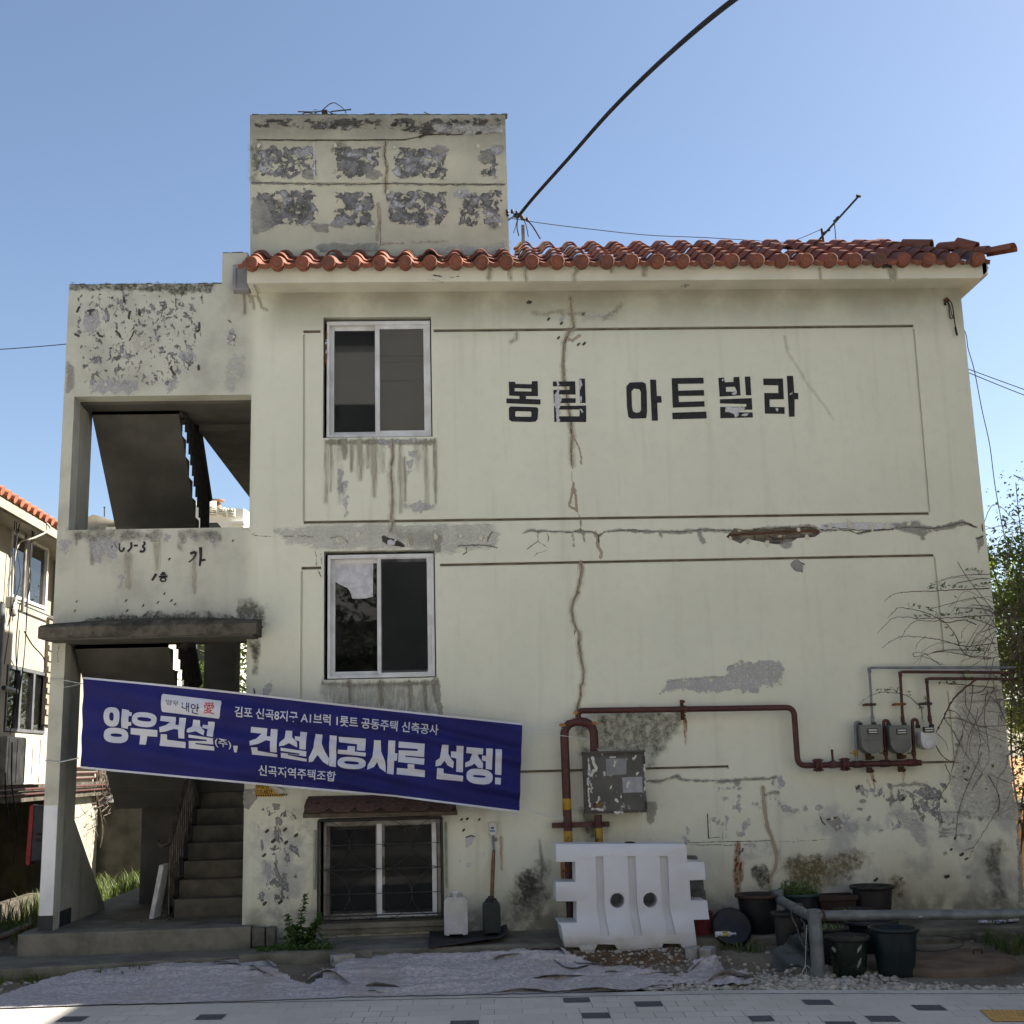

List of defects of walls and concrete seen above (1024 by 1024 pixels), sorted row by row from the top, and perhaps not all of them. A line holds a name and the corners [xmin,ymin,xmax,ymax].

peeling [251,117,503,252]
peeling [66,283,213,395]
damp [325,438,437,517]
crack [525,296,732,711]
spalling [727,519,965,548]
crack [820,521,983,540]
damp [76,530,264,628]
peeling [659,660,784,695]
damp [581,713,680,754]
peeling [243,788,300,906]
damp [513,846,549,913]
peeling [778,775,983,860]